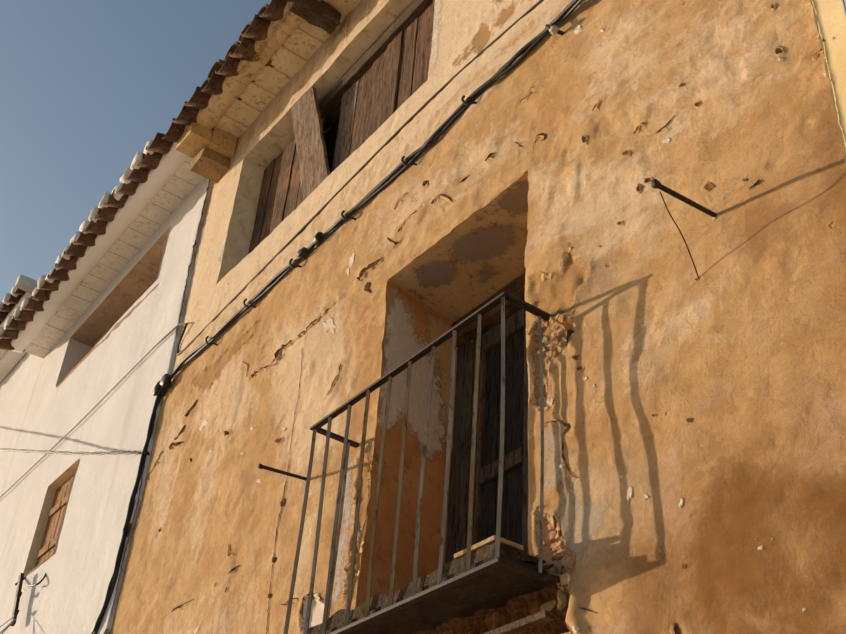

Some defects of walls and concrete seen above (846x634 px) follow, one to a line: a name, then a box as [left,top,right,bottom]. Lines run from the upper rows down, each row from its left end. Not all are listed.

flaking render [452,0,516,66]
peeling [377,288,447,460]
crack [244,302,336,634]
flaking render [298,593,324,633]
flaking render [333,451,372,608]
flaking render [413,504,580,634]
crack [540,420,579,478]
crack [669,623,679,634]
damp [691,464,846,634]